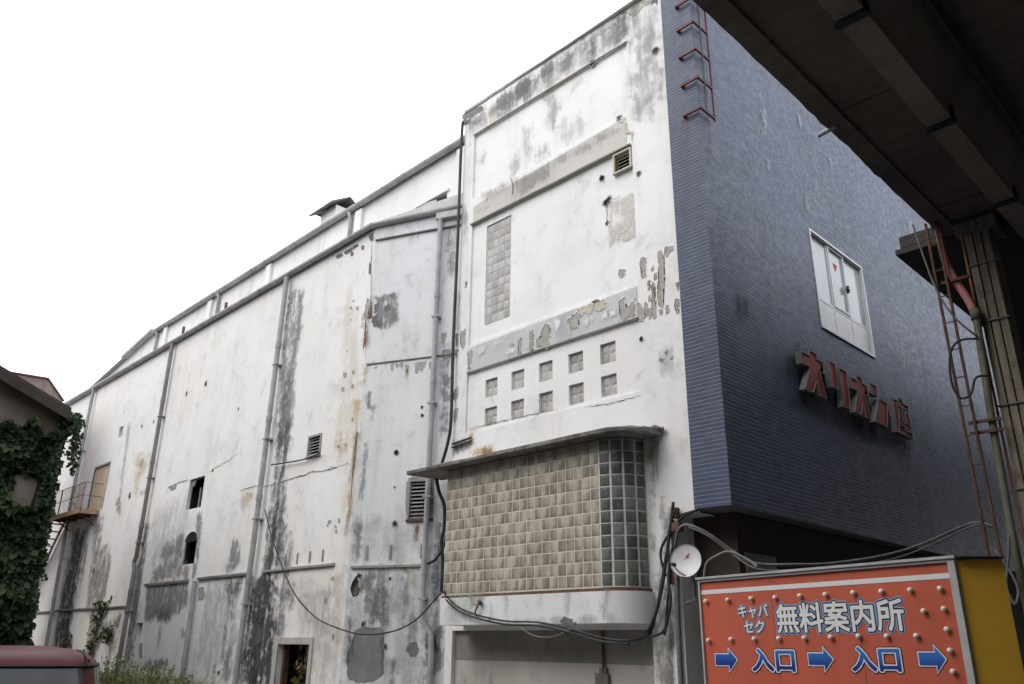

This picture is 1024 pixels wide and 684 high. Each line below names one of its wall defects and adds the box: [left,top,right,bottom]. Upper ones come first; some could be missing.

water stain [497,54,572,115]
peeling [350,288,398,350]
peeling [374,245,680,373]
water stain [275,291,304,447]
crack [166,458,231,492]
crack [243,463,348,490]
water stain [55,519,110,658]
water stain [222,511,293,684]
spalling [350,573,367,597]